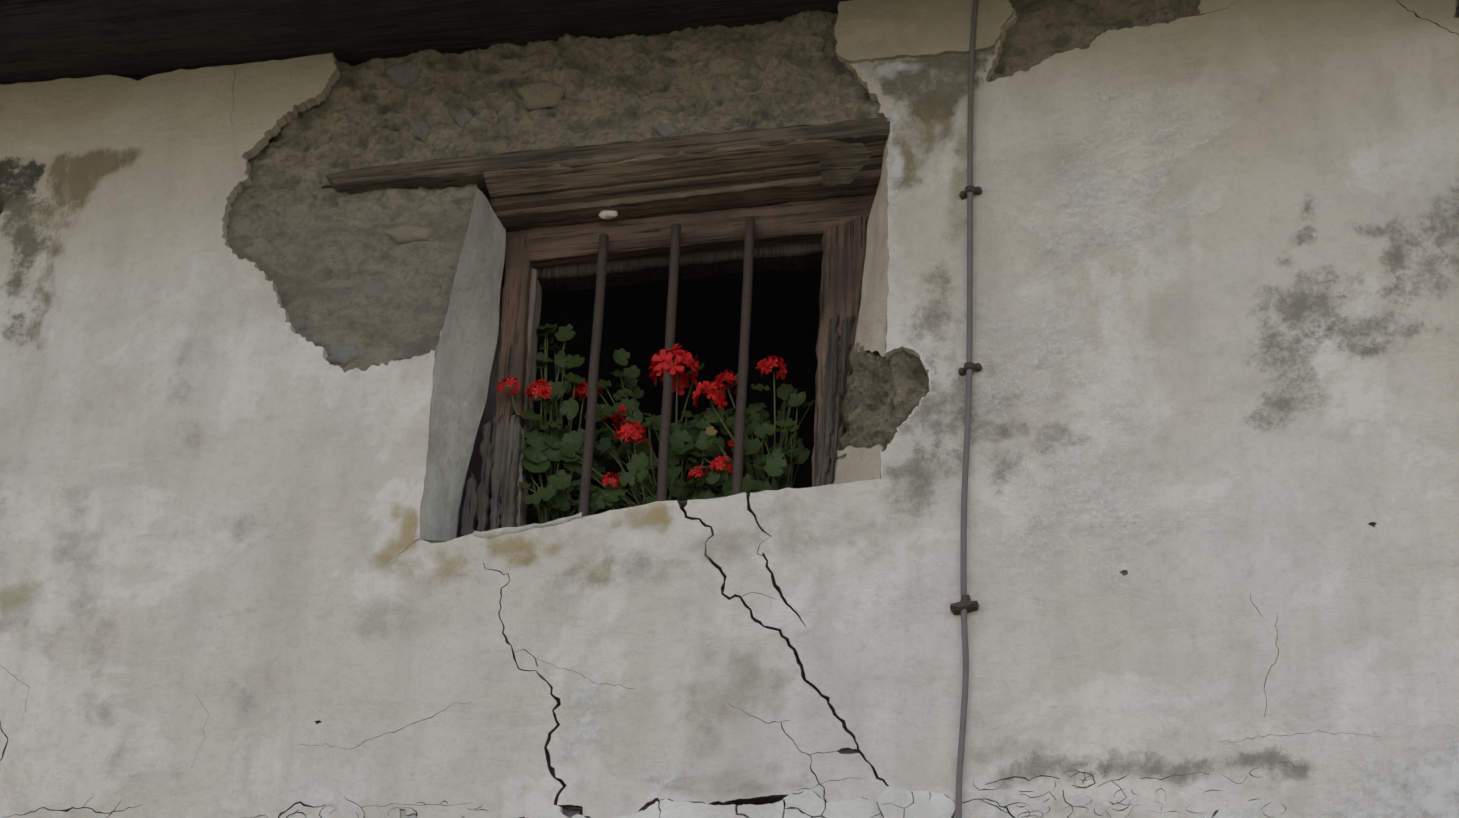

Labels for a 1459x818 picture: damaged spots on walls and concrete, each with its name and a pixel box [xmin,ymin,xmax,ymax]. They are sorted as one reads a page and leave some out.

spalling [989,0,1201,82]
leakage [0,150,136,294]
spalling [226,10,884,372]
leakage [858,46,996,197]
leakage [1280,292,1386,353]
spalling [836,343,930,458]
crack [484,565,631,818]
crack [641,491,1015,818]
crack [345,798,468,816]